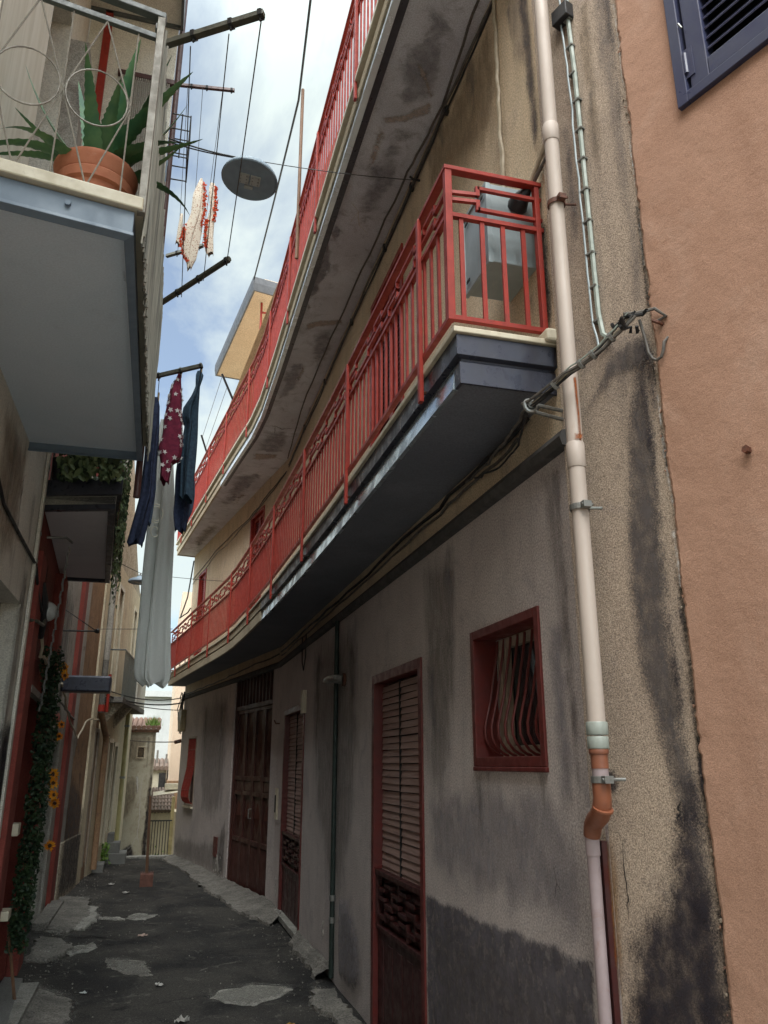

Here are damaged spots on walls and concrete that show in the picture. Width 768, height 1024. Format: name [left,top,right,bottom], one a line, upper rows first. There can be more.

leakage [426,896,595,1024]
leakage [627,345,731,1024]